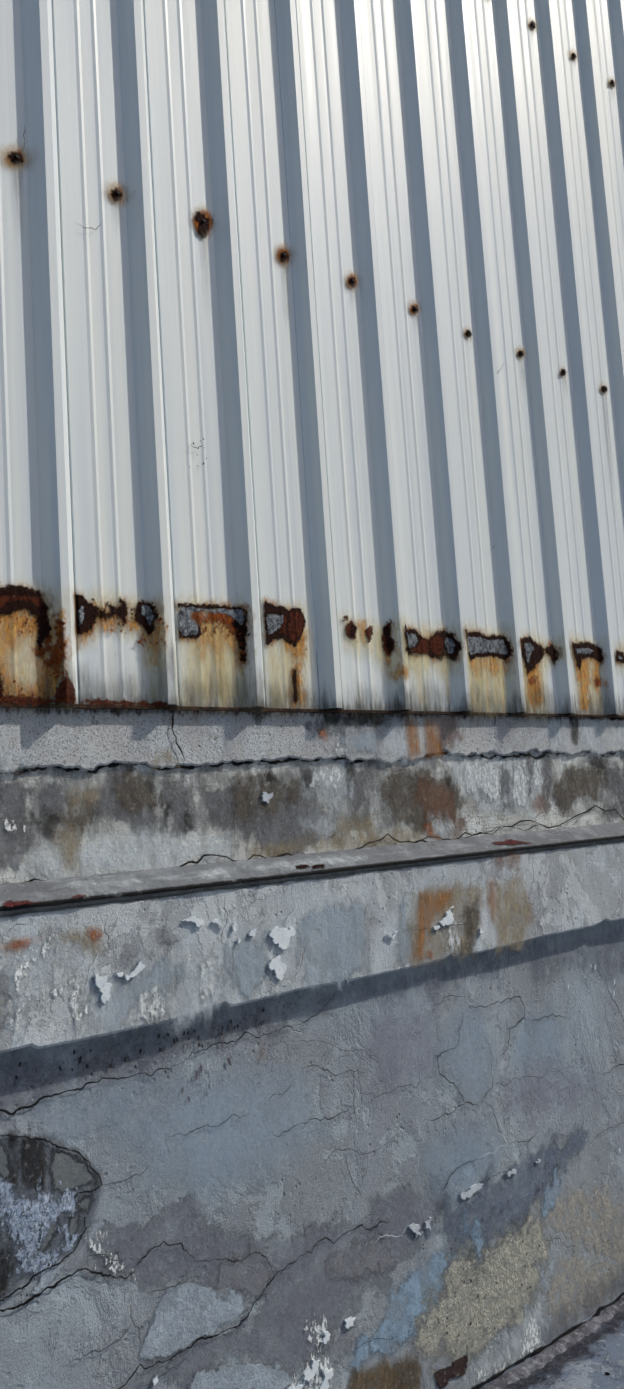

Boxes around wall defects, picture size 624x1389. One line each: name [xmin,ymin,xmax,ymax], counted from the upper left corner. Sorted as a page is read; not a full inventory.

corrosion [5,126,26,166]
corrosion [194,211,213,238]
corrosion [277,249,290,264]
corrosion [0,584,307,709]
corrosion [343,615,624,710]
damp [0,702,624,884]
crack [0,714,624,983]
peeling [0,915,295,1091]
damp [122,949,226,1028]
crack [0,979,624,1389]
flaking render [30,1259,64,1295]
flaking render [82,1229,126,1278]